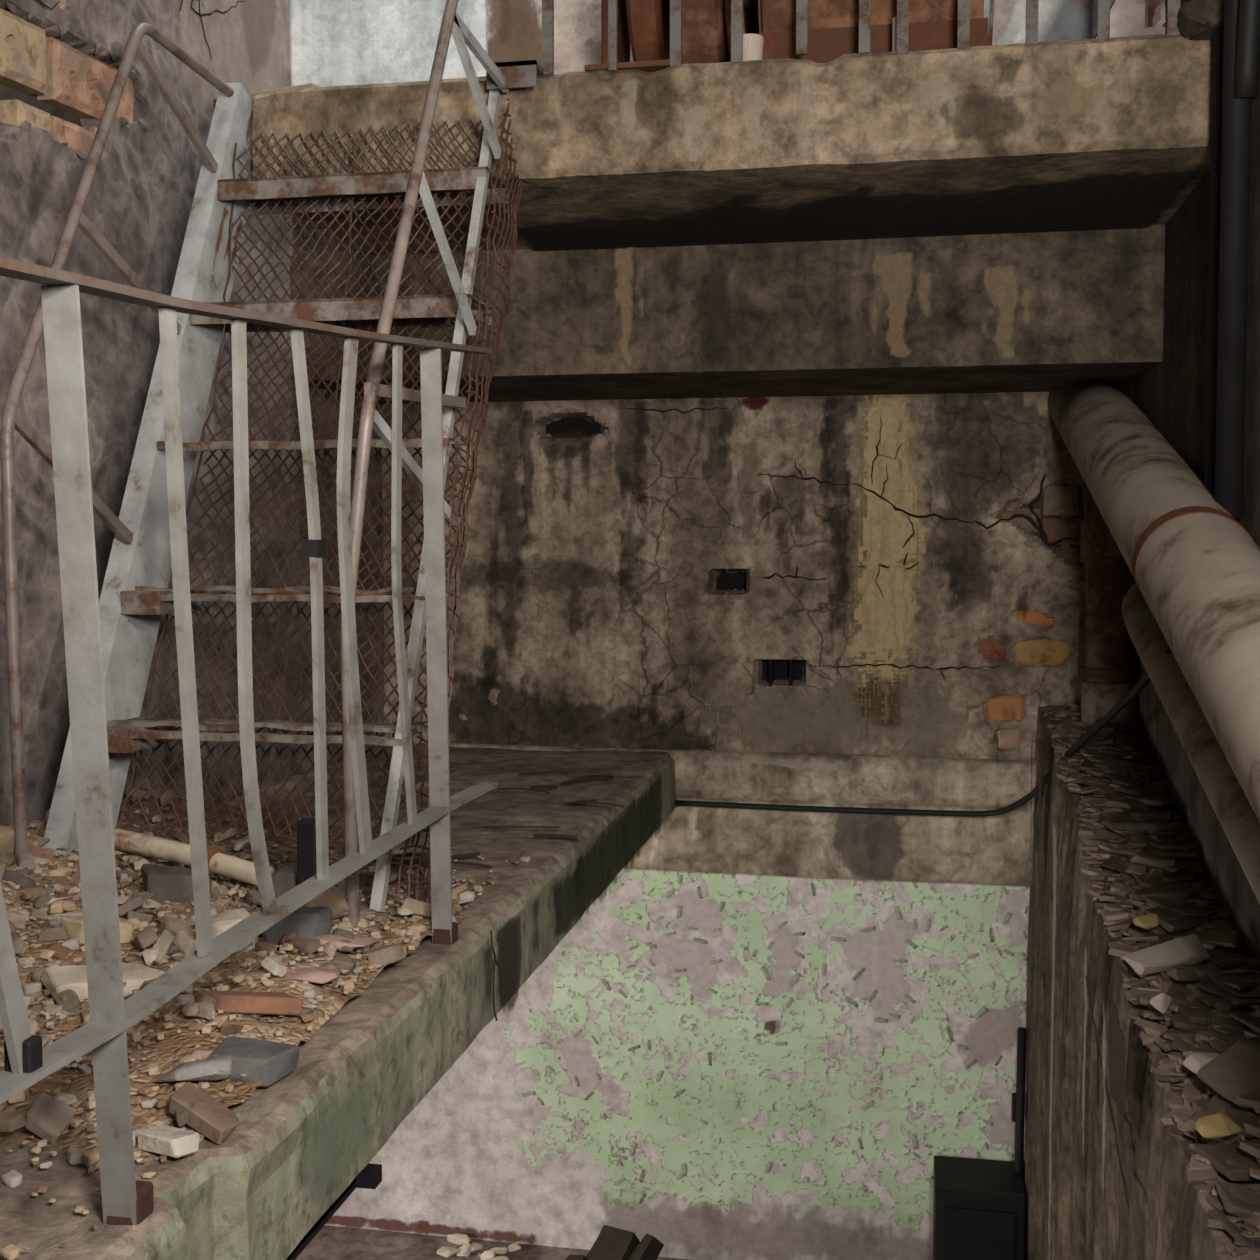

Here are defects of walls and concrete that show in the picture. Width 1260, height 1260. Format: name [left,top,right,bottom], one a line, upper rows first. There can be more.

flaking render [0,0,147,160]
crack [179,0,245,60]
leakage [448,394,968,753]
crack [750,417,1076,598]
crack [815,663,999,681]
flaking render [986,696,1024,750]
peeling [503,868,1028,1230]